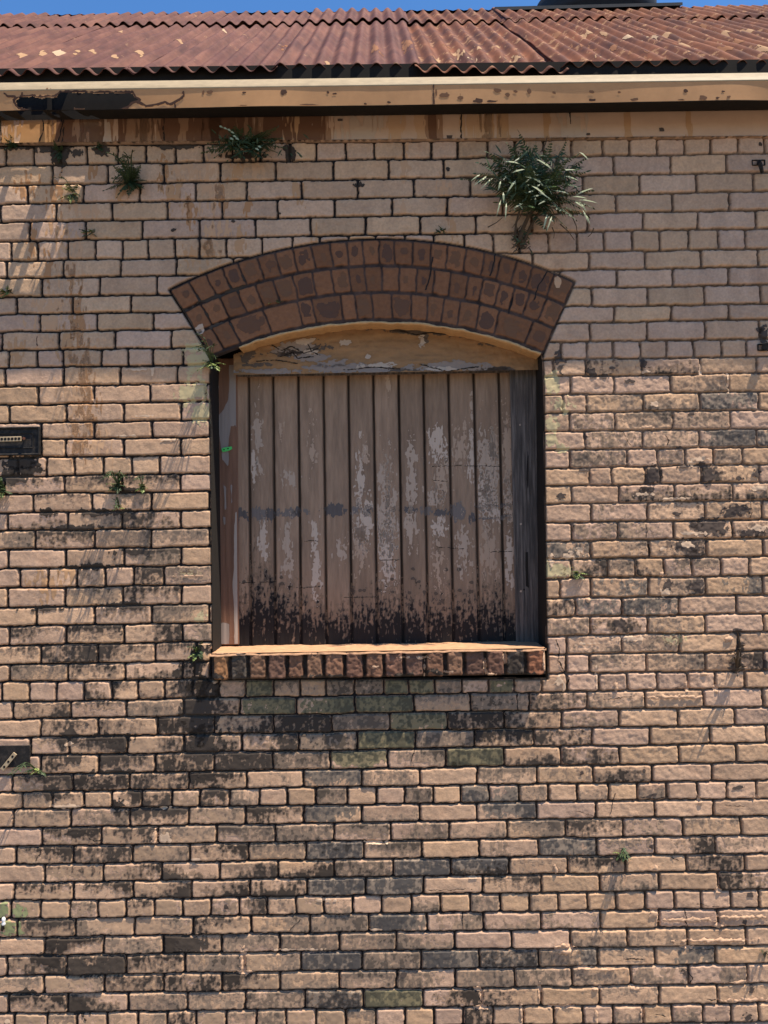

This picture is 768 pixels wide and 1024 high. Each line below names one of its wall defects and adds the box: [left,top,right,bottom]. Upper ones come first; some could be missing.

peeling [219,338,494,490]
peeling [310,391,515,607]
mould [622,466,768,503]
peeling [257,511,294,592]
water stain [212,534,525,680]
water stain [10,614,331,907]
water stain [448,693,644,782]
mould [568,857,621,867]
mould [689,836,760,890]
water stain [14,842,360,991]
water stain [10,994,119,1012]
water stain [448,989,504,1024]